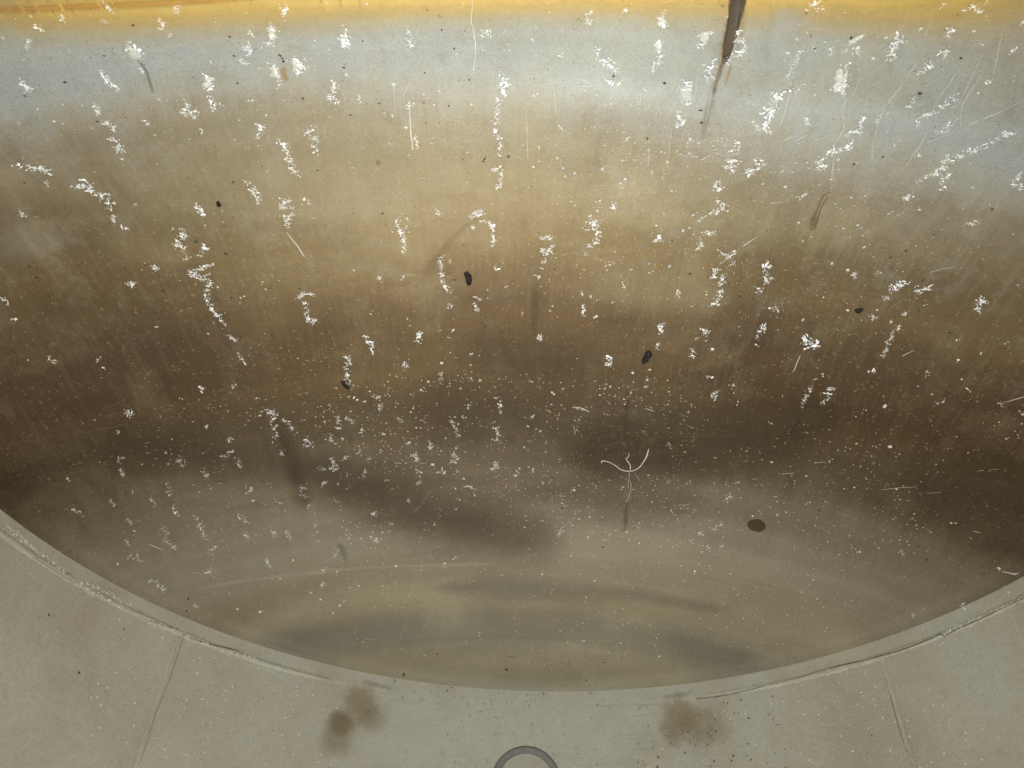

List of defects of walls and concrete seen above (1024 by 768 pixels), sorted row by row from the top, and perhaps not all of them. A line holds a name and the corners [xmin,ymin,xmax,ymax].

corrosion [10,0,963,93]
leakage [588,411,820,462]